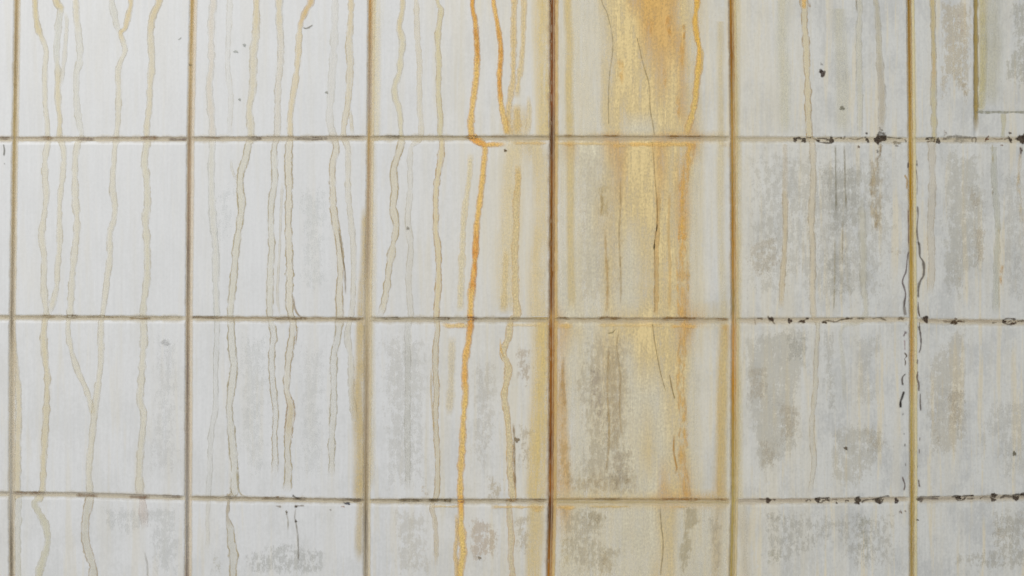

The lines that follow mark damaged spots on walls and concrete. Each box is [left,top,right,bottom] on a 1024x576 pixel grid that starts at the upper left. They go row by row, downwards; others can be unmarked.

leakage [793,0,842,158]
leakage [858,132,900,151]
leakage [268,0,312,527]
leakage [330,207,345,366]
leakage [432,140,445,385]
rust [447,0,740,576]
leakage [788,203,885,324]
crack [899,163,925,410]
leakage [809,495,902,513]
leakage [953,492,1024,501]